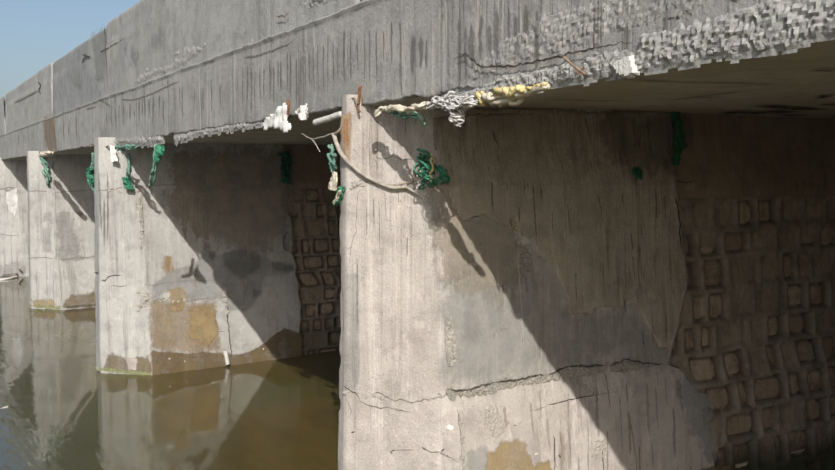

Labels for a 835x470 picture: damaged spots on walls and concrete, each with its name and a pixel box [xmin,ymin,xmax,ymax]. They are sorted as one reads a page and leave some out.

damp [105,329,303,375]
crack [342,386,447,417]
crack [532,372,623,432]